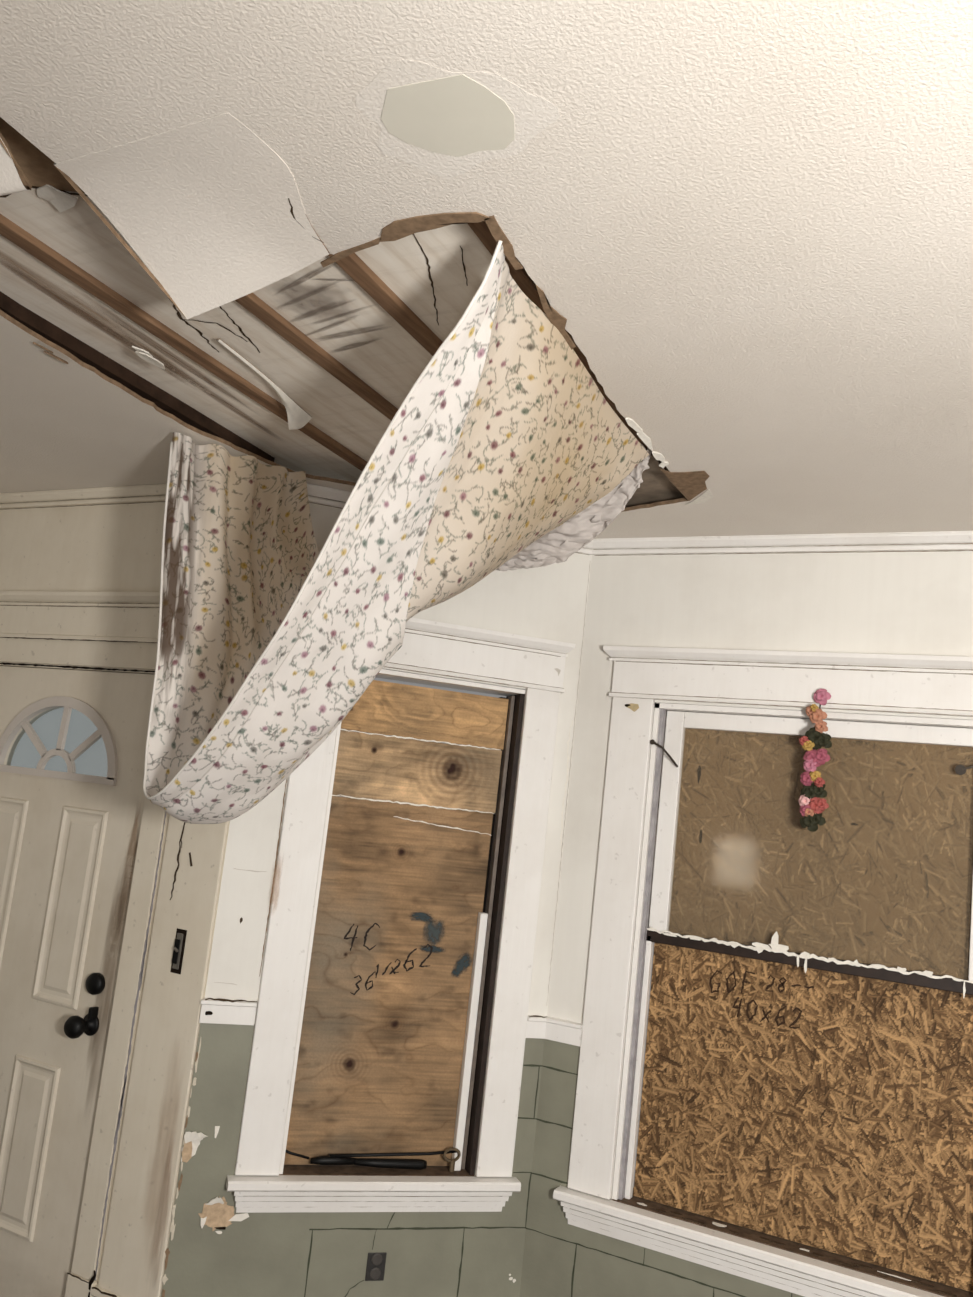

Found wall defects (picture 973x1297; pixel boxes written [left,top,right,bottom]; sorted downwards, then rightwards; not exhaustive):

peeling [321,238,381,267]
water stain [282,269,377,351]
peeling [536,285,576,350]
peeling [660,469,709,501]
peeling [162,1038,220,1297]
flaking render [198,1196,249,1234]